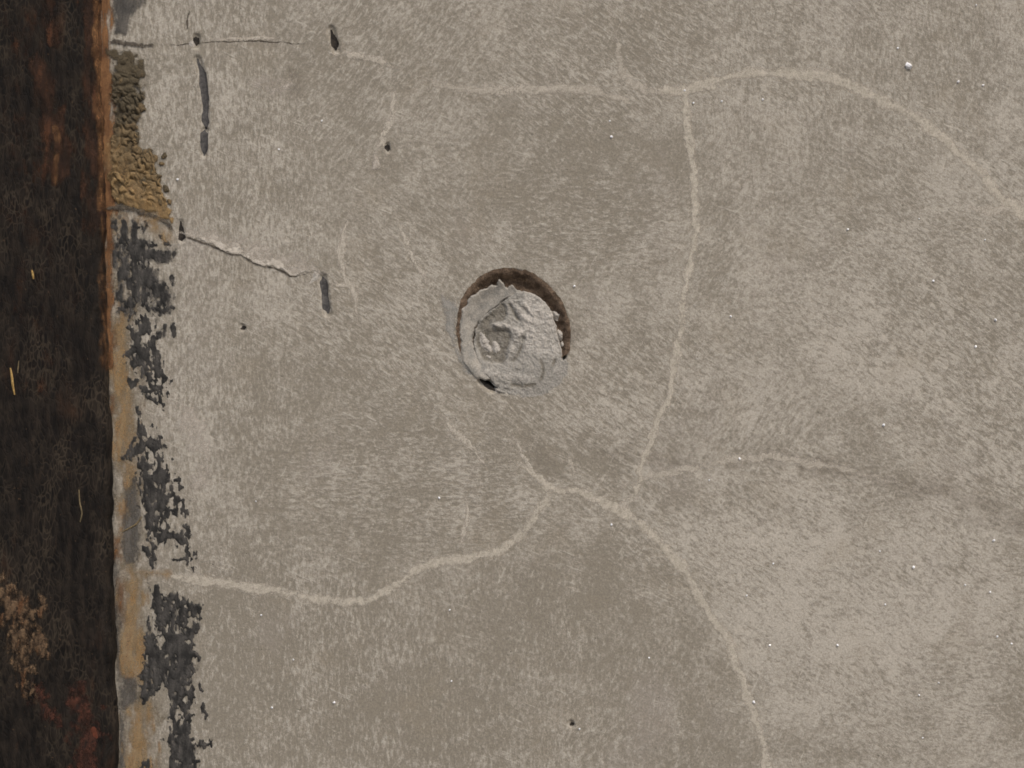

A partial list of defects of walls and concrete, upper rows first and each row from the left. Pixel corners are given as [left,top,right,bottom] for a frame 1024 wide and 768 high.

crack [372,92,397,169]
crack [422,77,629,104]
corrosion [28,0,130,487]
crack [106,205,358,314]
crack [441,414,484,463]
peeling [479,332,501,358]
spalling [479,379,506,393]
peeling [552,311,564,347]
crack [513,32,1024,768]
peeling [111,216,213,768]
crack [164,494,552,608]
corrosion [30,680,111,768]